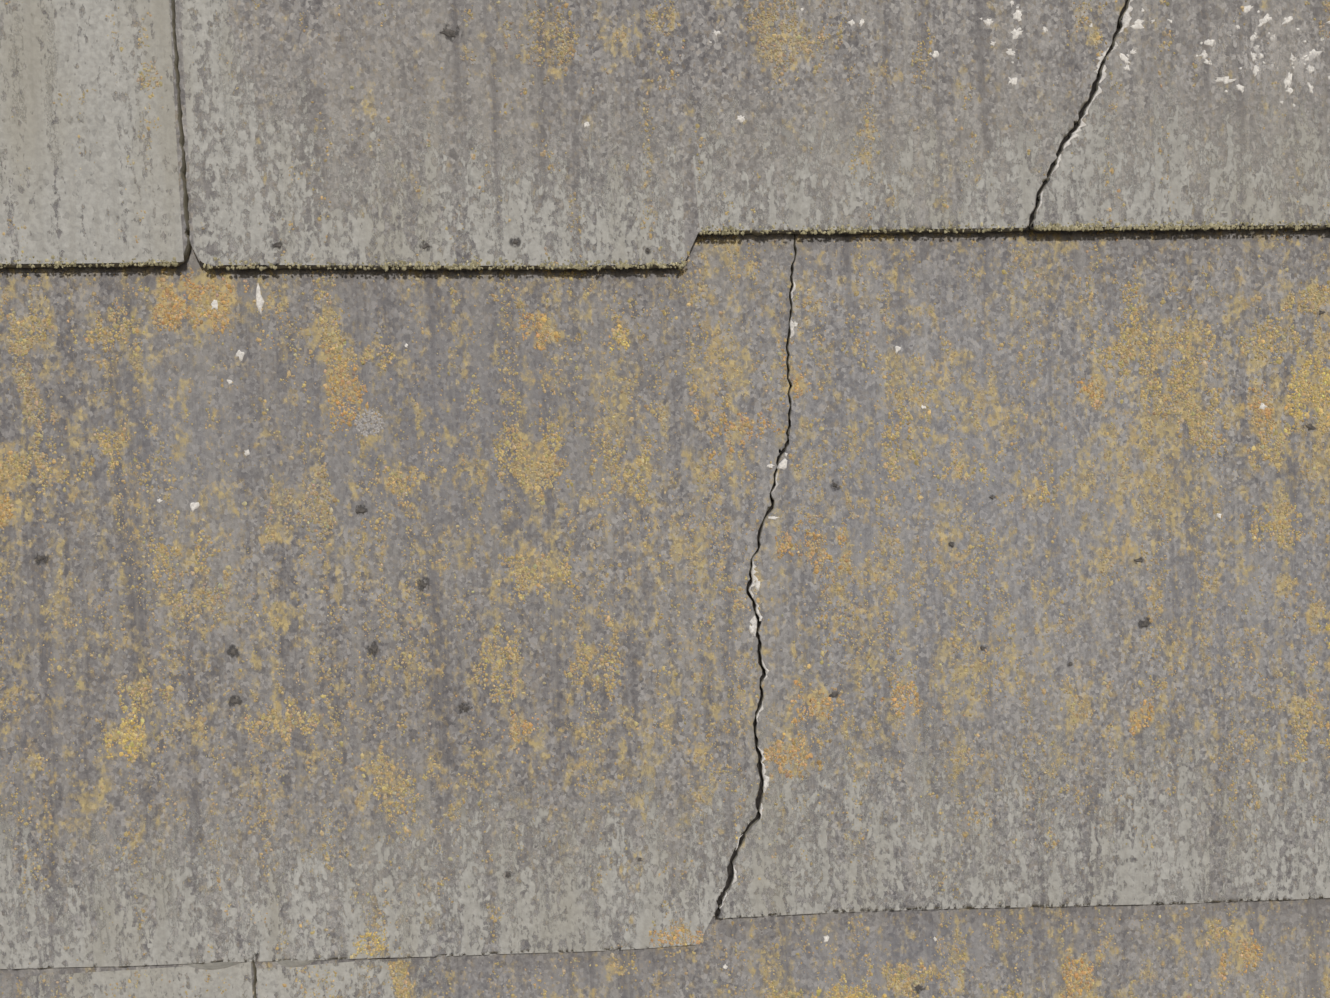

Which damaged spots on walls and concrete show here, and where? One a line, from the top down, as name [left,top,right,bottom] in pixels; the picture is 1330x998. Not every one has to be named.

crack [1025,0,1133,231]
crack [715,238,798,917]